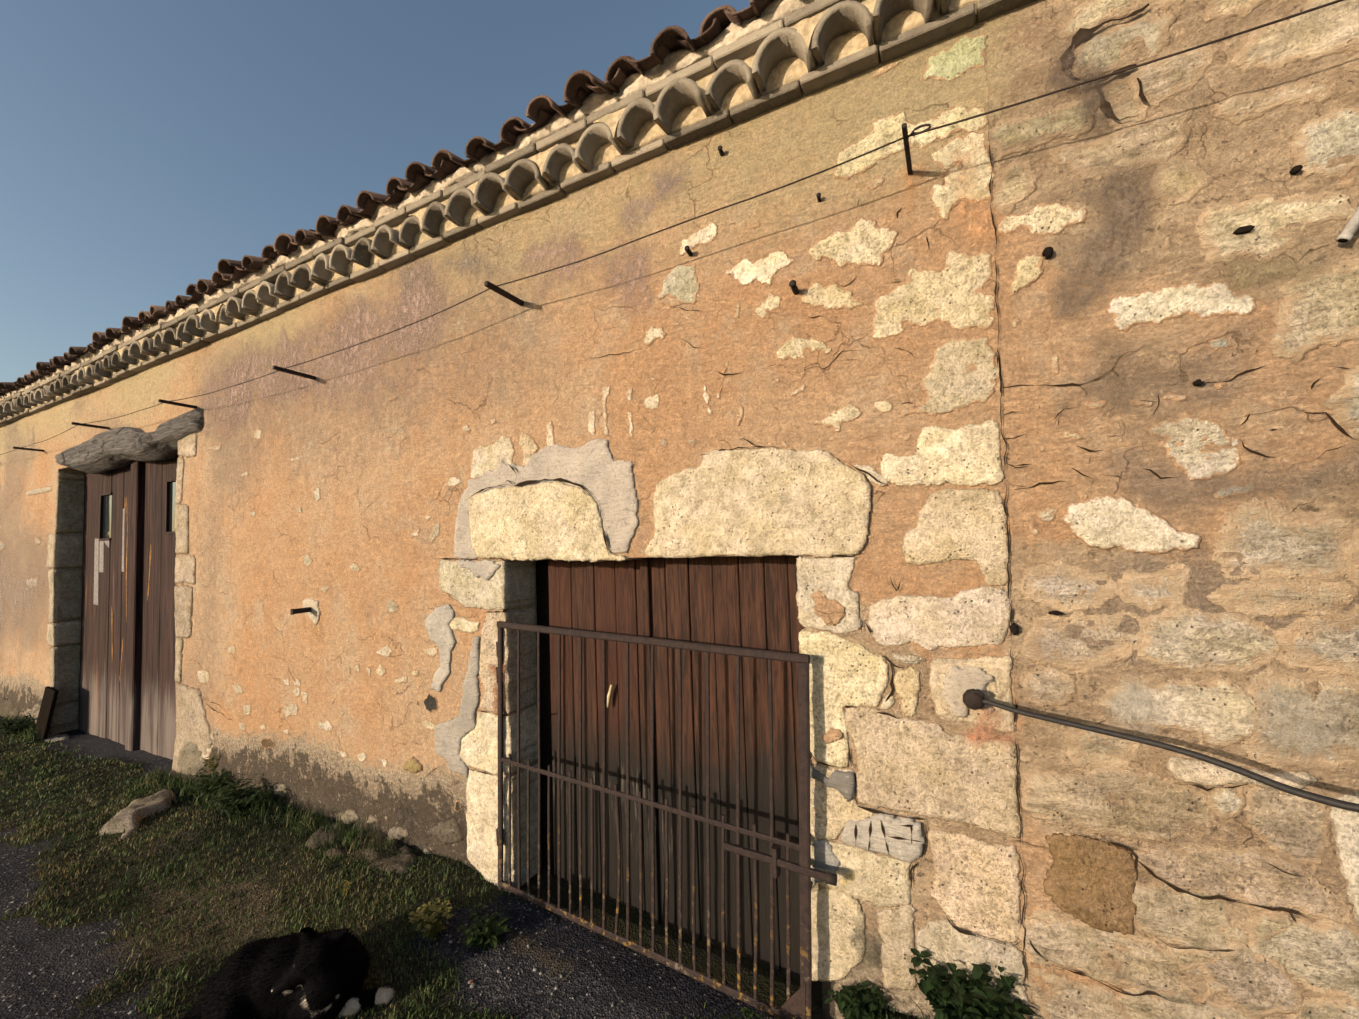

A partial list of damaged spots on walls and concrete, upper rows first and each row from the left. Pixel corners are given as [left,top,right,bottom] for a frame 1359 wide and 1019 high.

flaking render [833,106,995,221]
flaking render [658,221,718,305]
flaking render [997,202,1088,236]
water stain [1054,168,1143,315]
flaking render [644,323,679,346]
flaking render [725,217,1045,433]
flaking render [447,418,555,487]
flaking render [695,385,721,416]
crack [998,345,1264,490]
crack [1237,366,1356,464]
peeling [811,590,845,626]